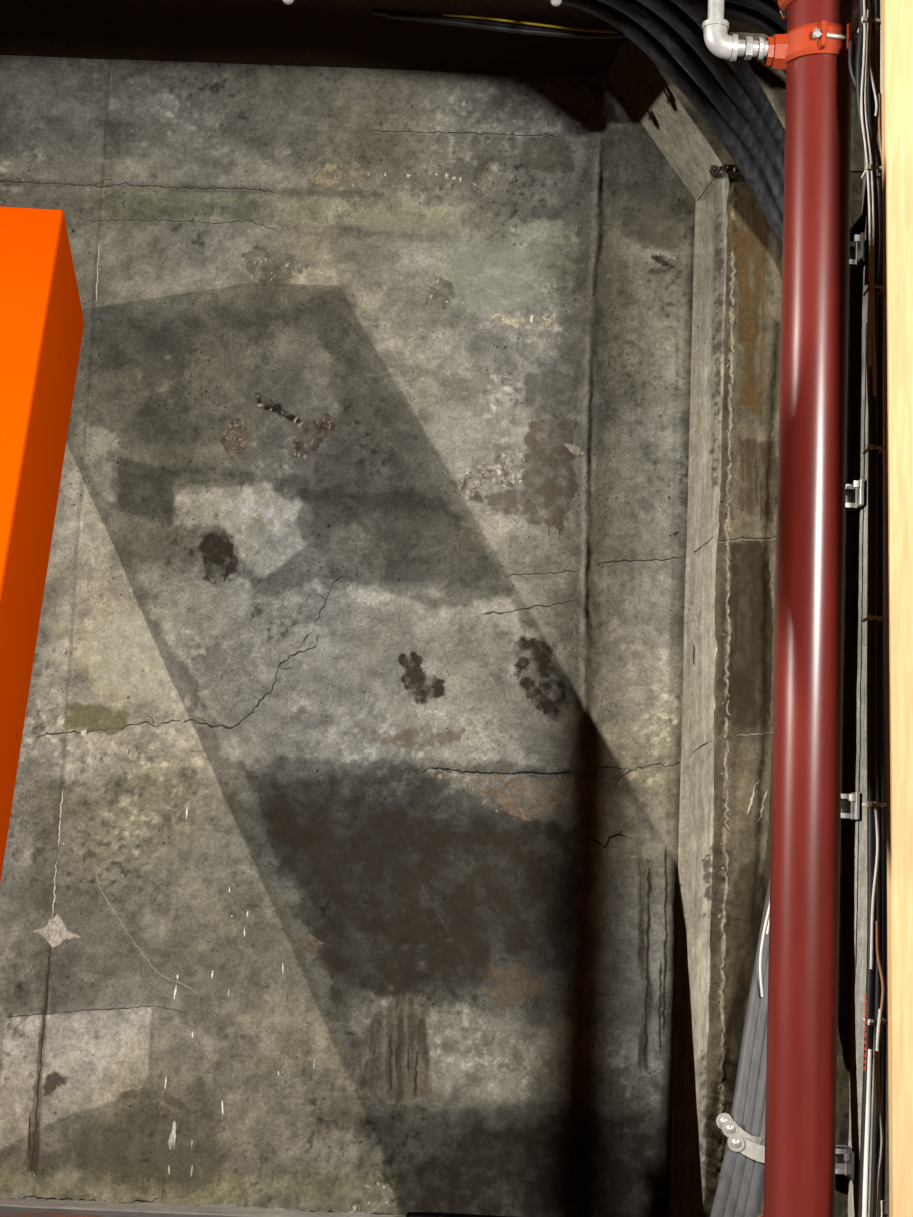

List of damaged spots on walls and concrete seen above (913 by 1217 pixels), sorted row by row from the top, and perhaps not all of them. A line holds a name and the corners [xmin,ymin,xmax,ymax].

spalling [456,449,526,502]
water stain [199,533,237,583]
crack [483,534,777,615]
crack [36,576,343,738]
water stain [399,652,444,703]
water stain [515,636,566,715]